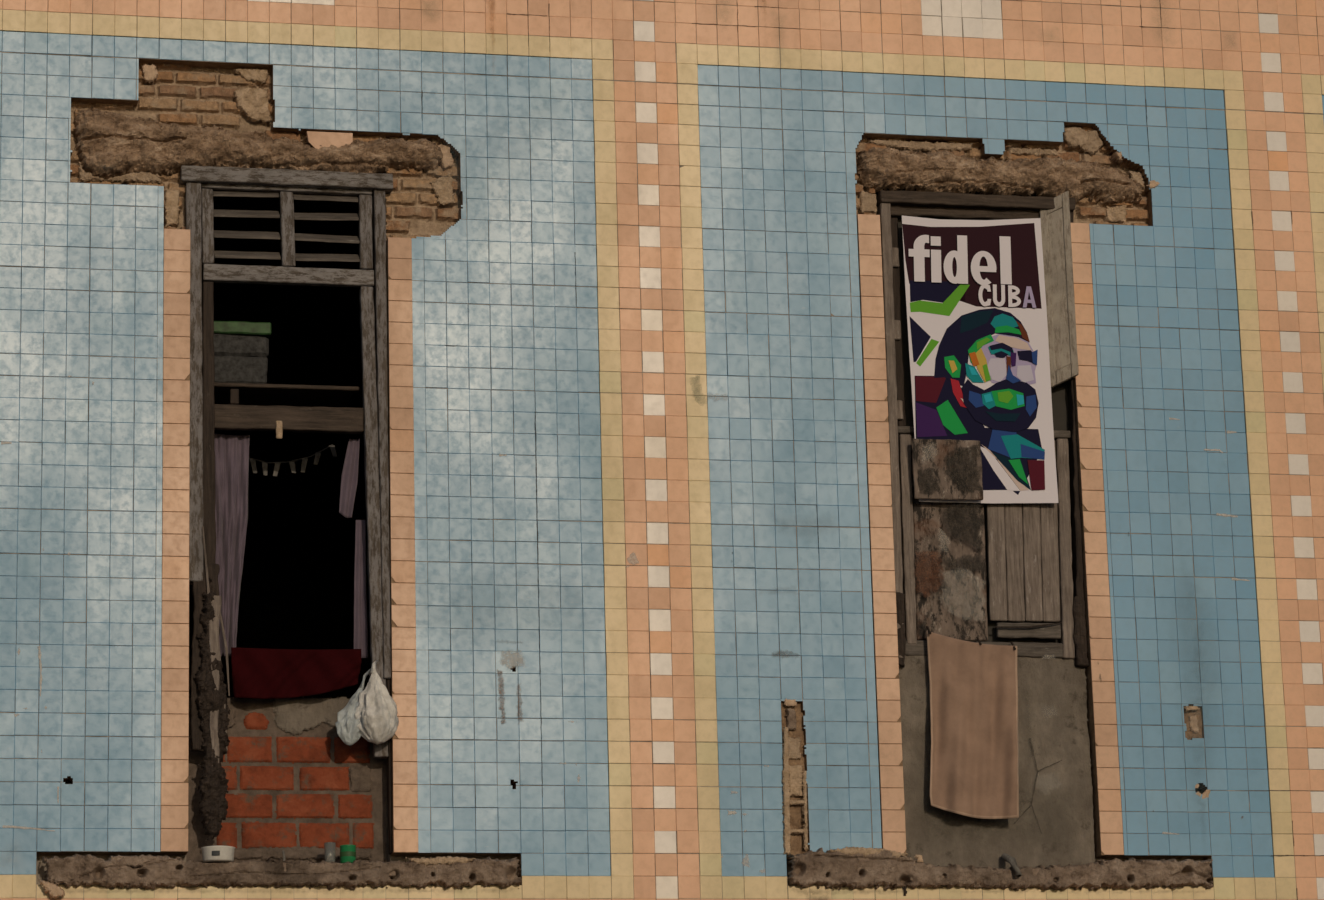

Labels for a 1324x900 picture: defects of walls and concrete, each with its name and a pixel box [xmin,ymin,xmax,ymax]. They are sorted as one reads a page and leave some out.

flaking render [70,58,463,240]
flaking render [855,122,1214,886]
peeling [768,698,810,861]
spalling [36,852,160,899]
spalling [415,853,522,885]